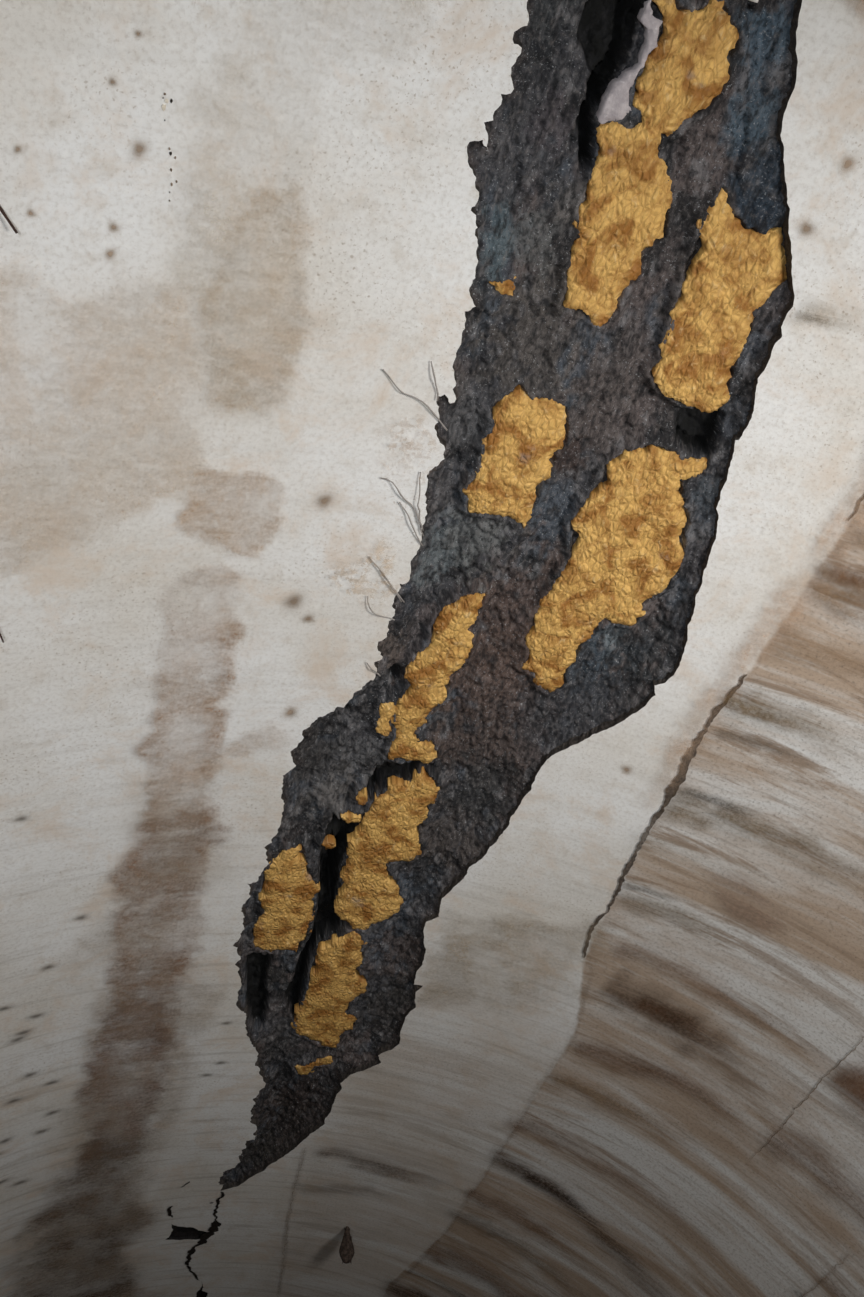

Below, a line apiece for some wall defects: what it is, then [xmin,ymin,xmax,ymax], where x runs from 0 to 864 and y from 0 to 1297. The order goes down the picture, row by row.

spalling [218,0,802,1191]
crack [848,496,864,521]
crack [583,674,747,958]
leakage [36,951,189,1297]
crack [167,1182,224,1281]